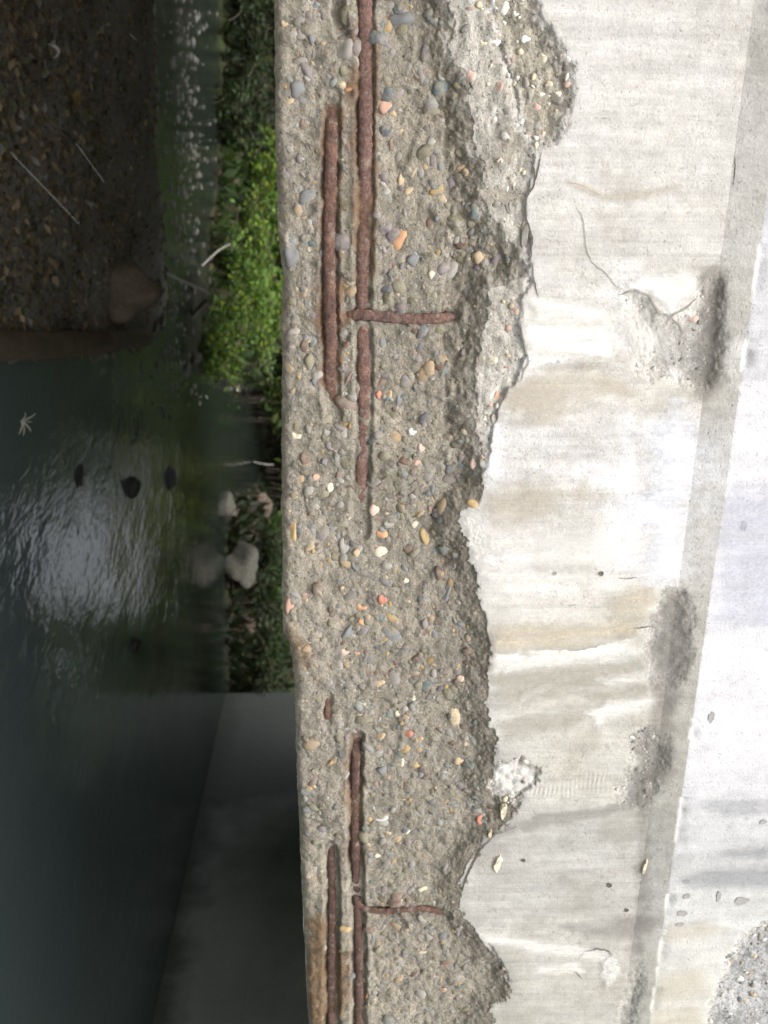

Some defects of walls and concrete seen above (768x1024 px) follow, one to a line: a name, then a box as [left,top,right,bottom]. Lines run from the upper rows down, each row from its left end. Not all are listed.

rust [333,69,373,162]
rust [316,274,348,339]
crack [568,182,697,335]
water stain [629,276,691,308]
spalling [274,0,542,1024]
rust [308,916,349,1024]
spalling [705,921,768,1024]